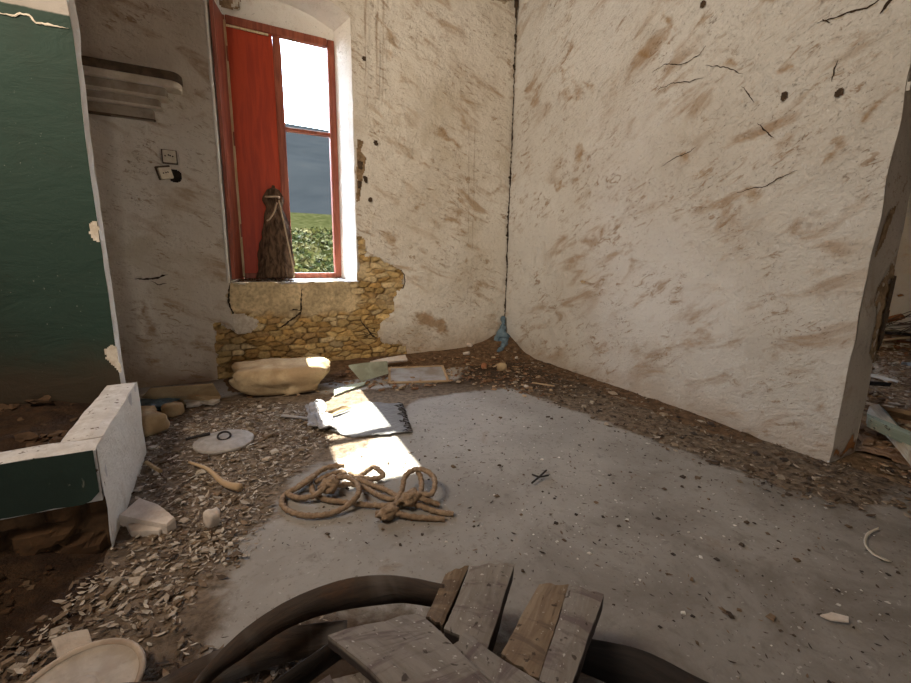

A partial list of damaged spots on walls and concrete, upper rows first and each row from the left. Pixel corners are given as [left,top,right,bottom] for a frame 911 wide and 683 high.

crack [0,12,69,29]
flaking render [356,139,366,202]
flaking render [213,236,407,379]
flaking render [869,263,903,363]